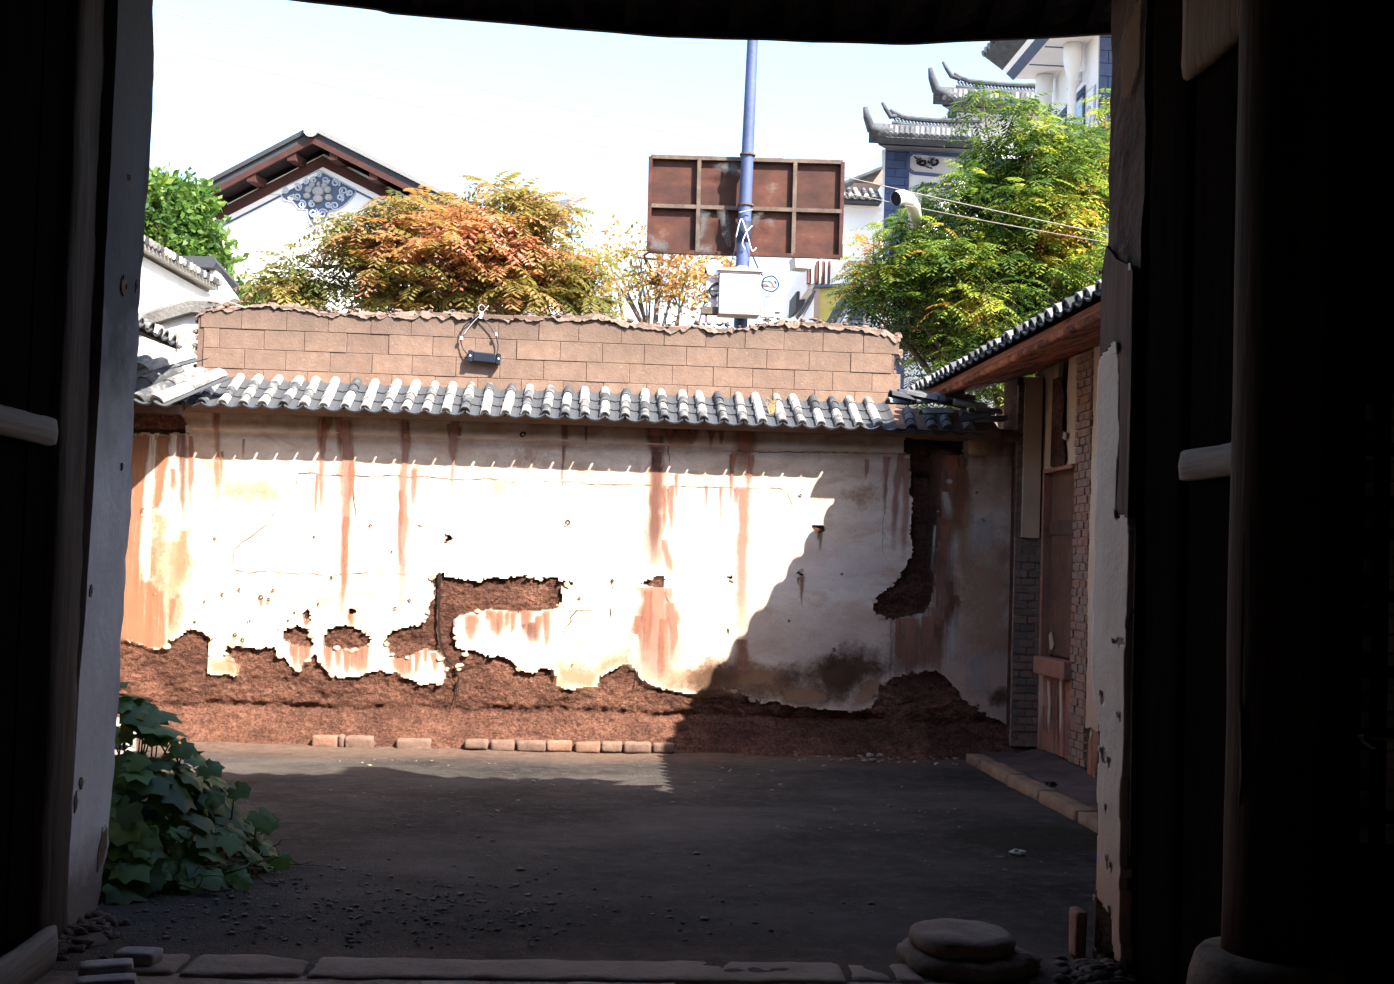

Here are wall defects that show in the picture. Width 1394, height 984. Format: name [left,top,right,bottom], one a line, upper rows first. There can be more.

spalling [872,438,963,620]
spalling [119,572,1023,760]